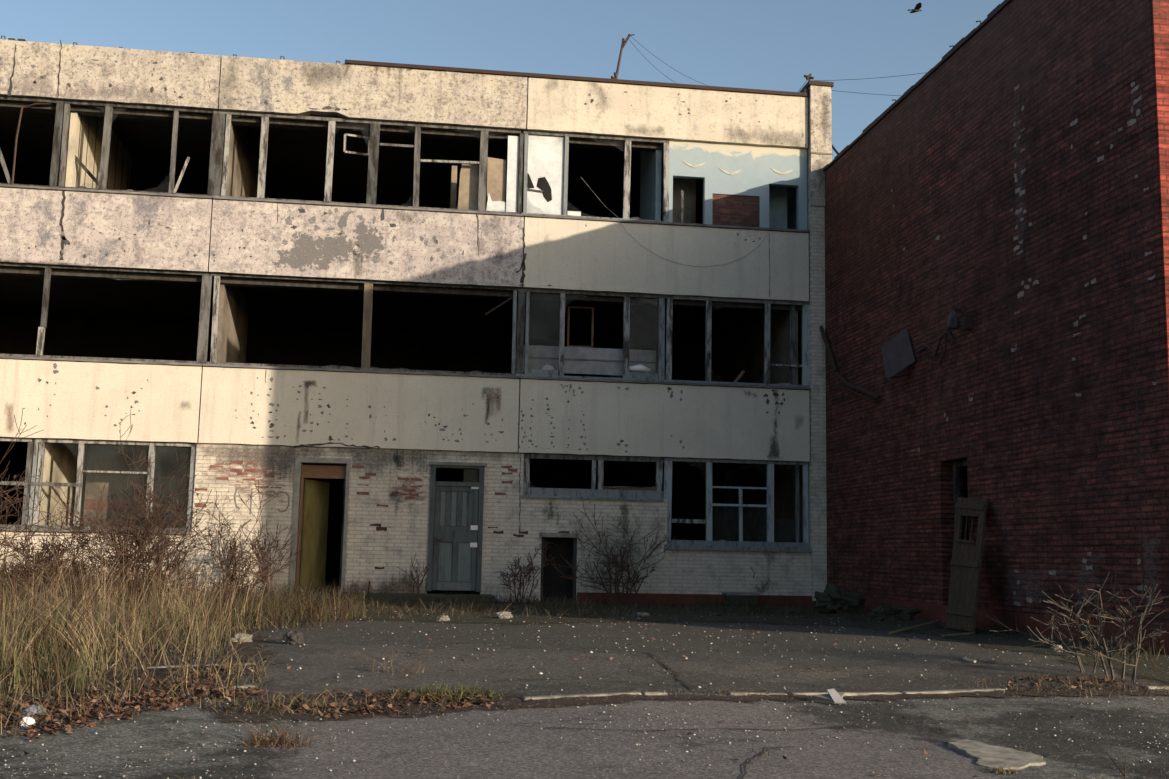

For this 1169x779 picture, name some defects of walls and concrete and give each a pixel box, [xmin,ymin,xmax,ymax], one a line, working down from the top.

crack [59,190,70,260]
peeling [273,208,404,272]
peeling [420,236,445,261]
flaking render [194,455,284,508]
flaking render [352,465,424,507]